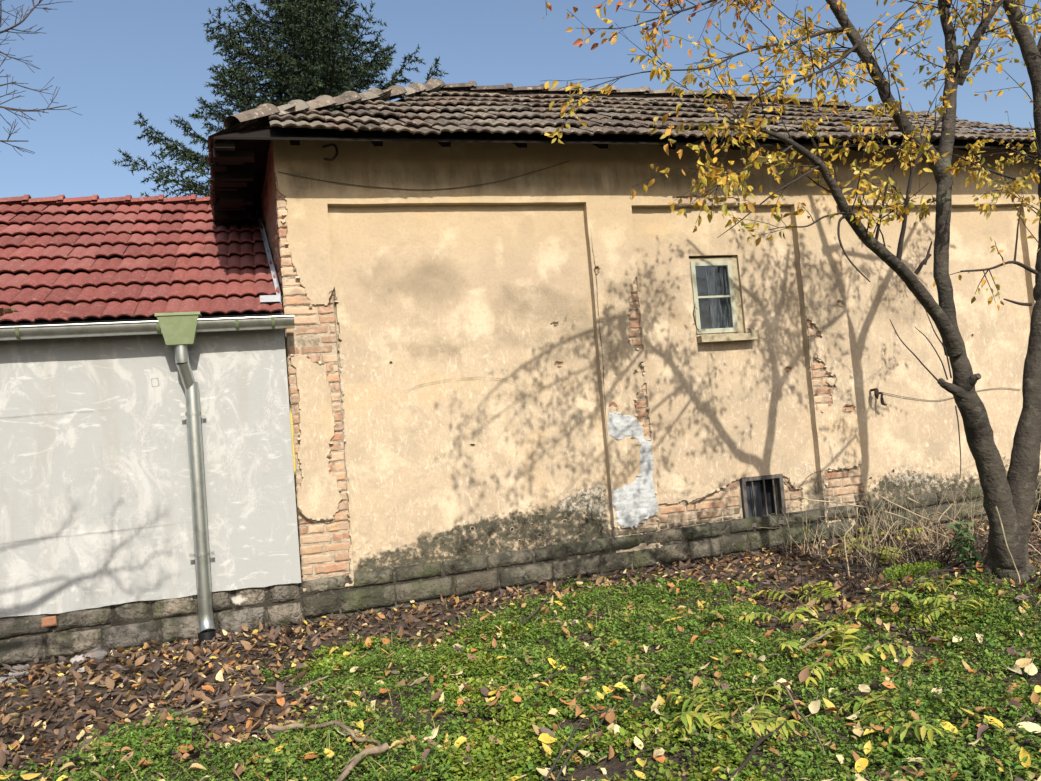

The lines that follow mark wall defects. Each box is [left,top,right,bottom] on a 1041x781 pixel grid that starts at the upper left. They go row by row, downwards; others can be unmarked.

flaking render [627,278,642,350]
flaking render [801,321,823,339]
flaking render [276,178,353,581]
flaking render [805,357,855,412]
damp [354,486,615,573]
peeling [607,363,743,538]
flaking render [783,477,803,513]
flaking render [824,464,876,507]